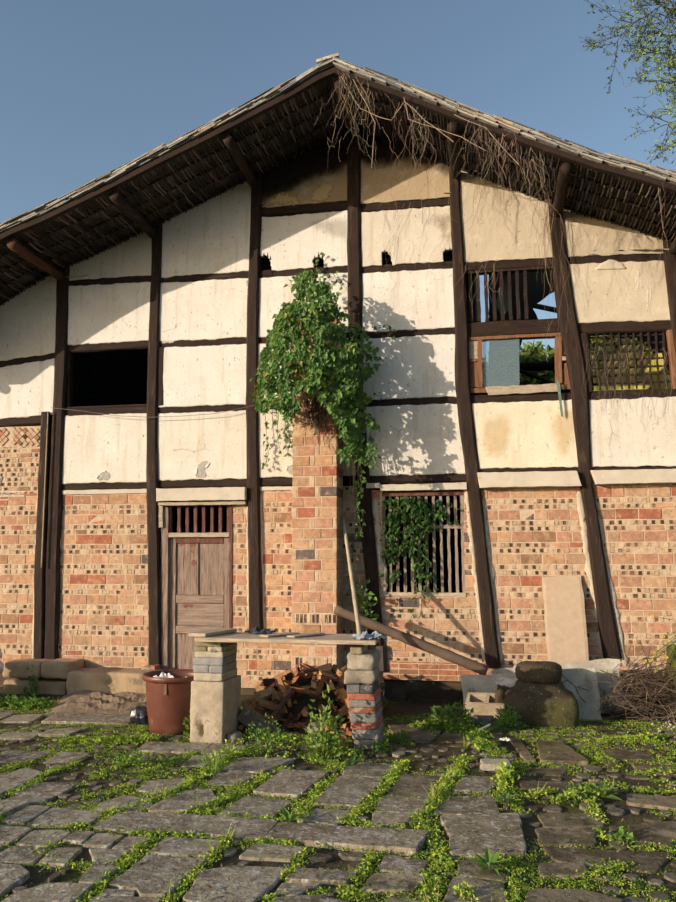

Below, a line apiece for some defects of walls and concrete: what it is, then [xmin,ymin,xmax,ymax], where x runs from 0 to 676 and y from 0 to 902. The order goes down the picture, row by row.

spalling [195,461,210,478]